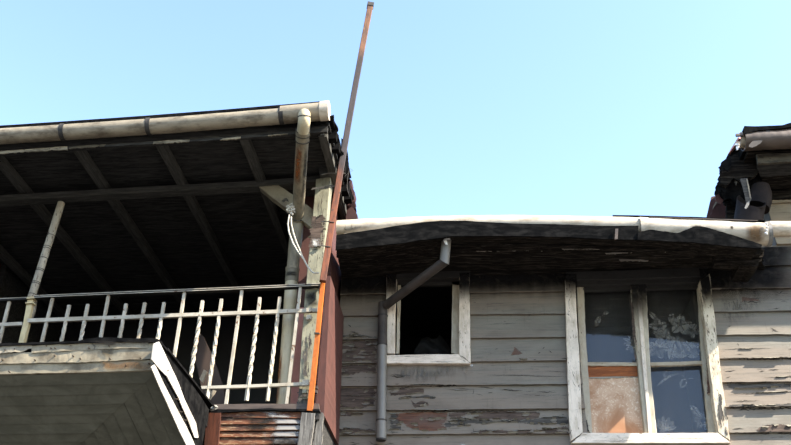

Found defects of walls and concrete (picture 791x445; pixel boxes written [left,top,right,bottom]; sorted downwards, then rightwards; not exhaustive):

peeling [308,214,326,248]
peeling [341,333,377,376]
peeling [340,388,377,416]
peeling [388,387,569,435]
peeling [706,363,791,435]